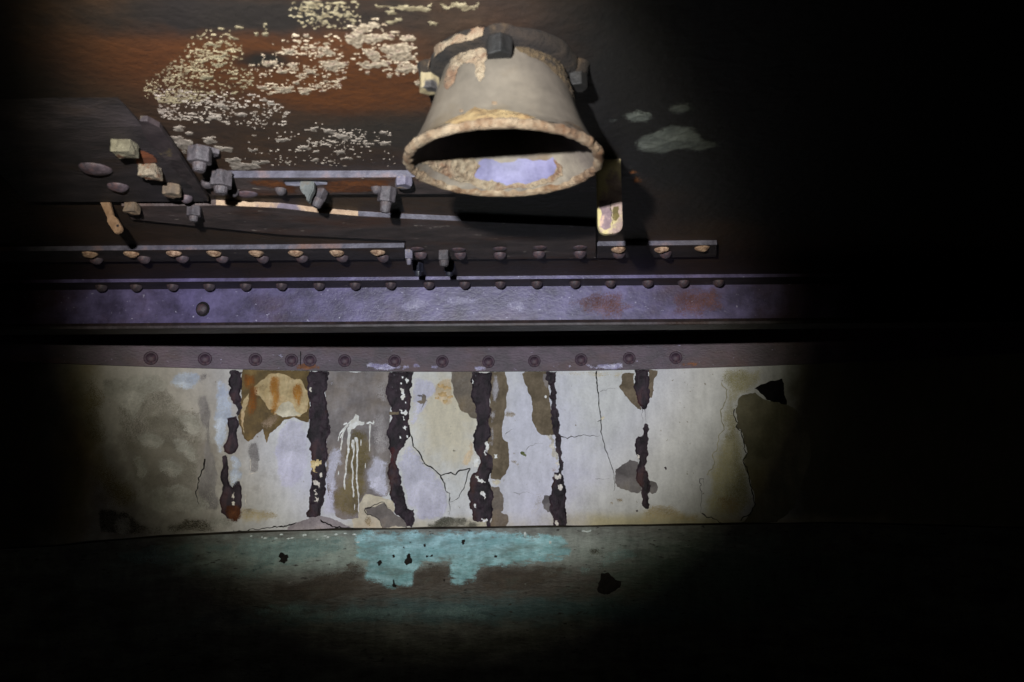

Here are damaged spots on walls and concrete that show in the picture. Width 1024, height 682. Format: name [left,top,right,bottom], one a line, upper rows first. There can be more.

corrosion [238,364,318,443]
peeling [182,370,572,610]
crack [409,425,470,505]
crack [561,371,615,490]
spalling [615,370,658,512]
peeling [733,379,811,523]